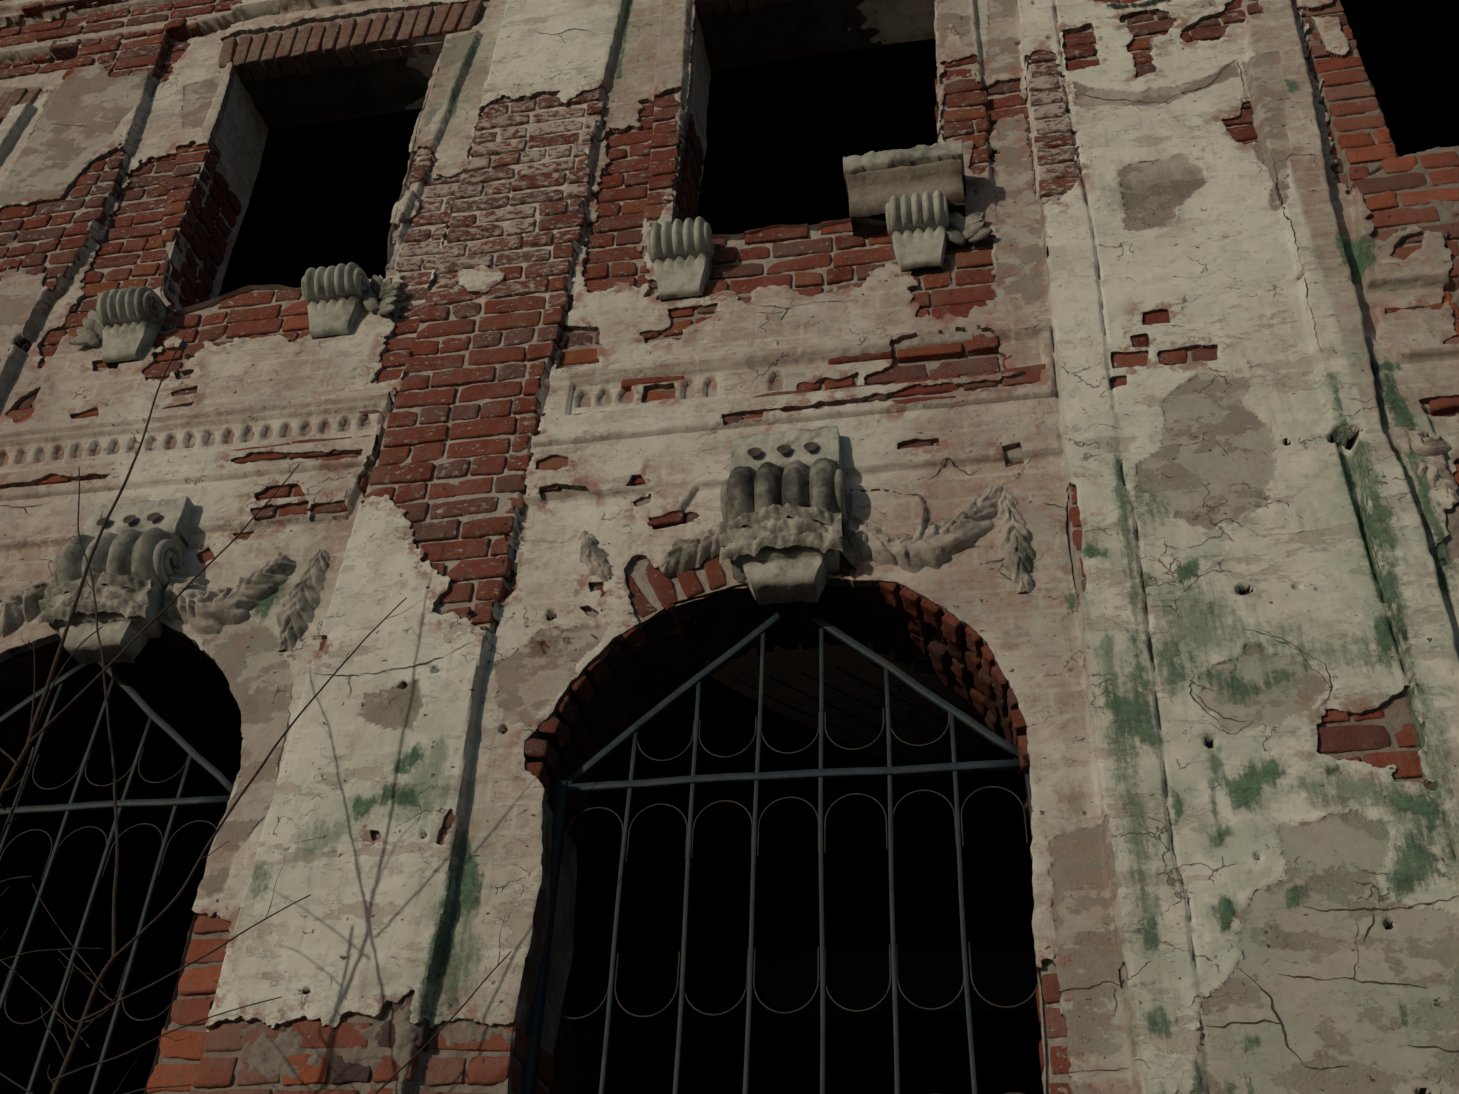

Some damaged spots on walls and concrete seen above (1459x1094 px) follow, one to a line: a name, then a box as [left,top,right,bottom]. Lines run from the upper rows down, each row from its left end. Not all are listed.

flaking render [0,0,490,409]
flaking render [1296,0,1459,344]
flaking render [231,0,1291,634]
flaking render [5,387,41,423]
flaking render [0,461,116,489]
flaking render [70,407,99,419]
flaking render [1418,394,1459,417]
flaking render [197,547,215,564]
flaking render [1197,643,1438,791]
flaking render [146,618,526,1094]
crack [1211,895,1459,1069]